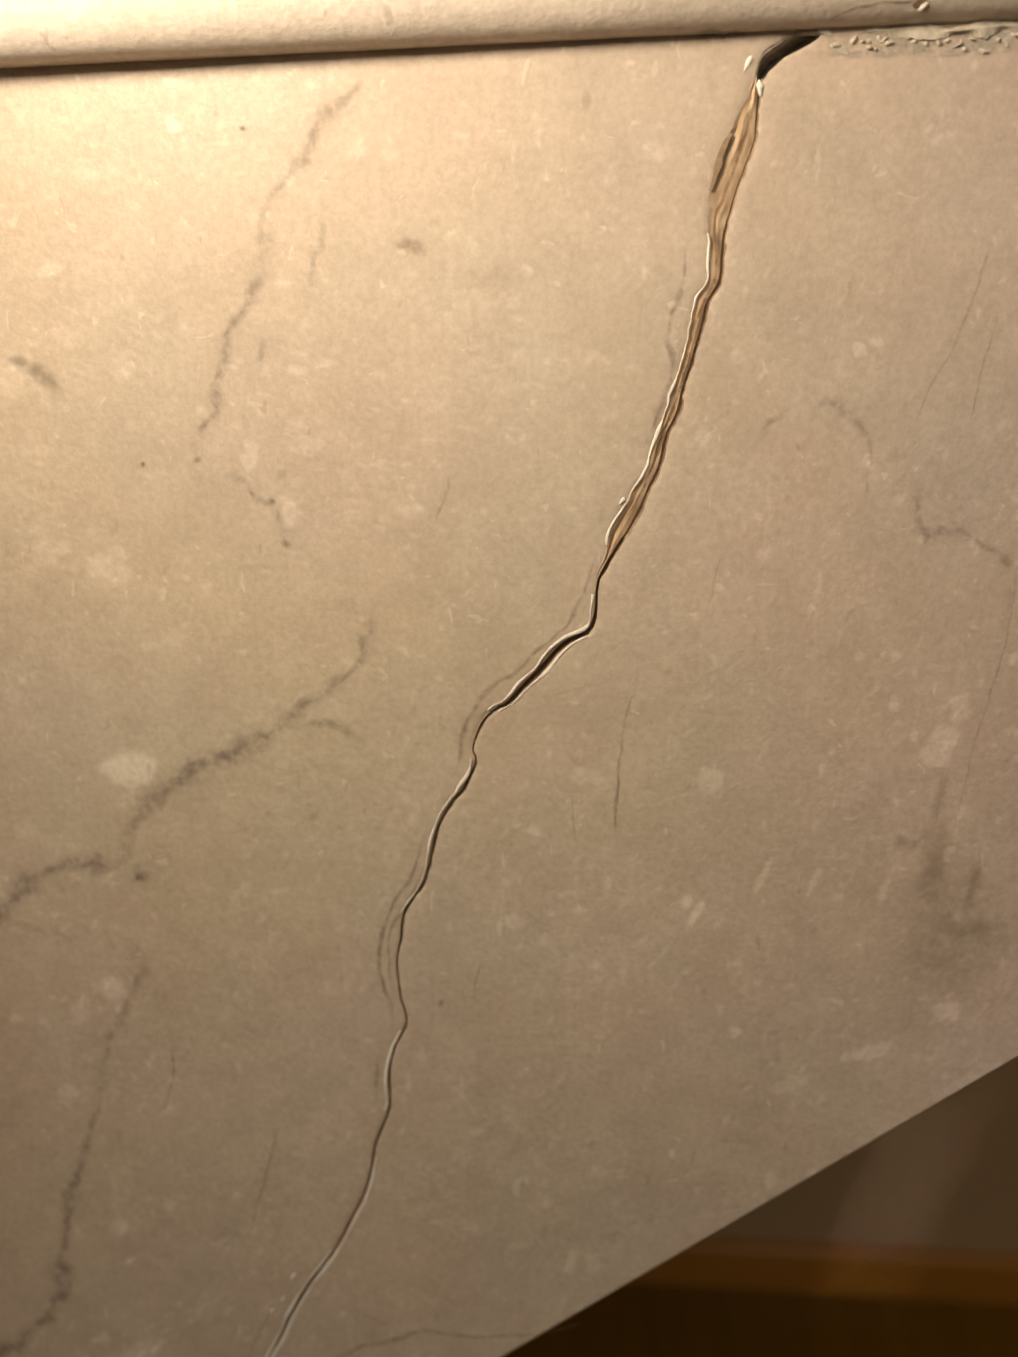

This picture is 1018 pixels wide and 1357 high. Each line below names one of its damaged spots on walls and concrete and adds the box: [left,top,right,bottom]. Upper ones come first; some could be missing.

crack [265,76,764,1357]